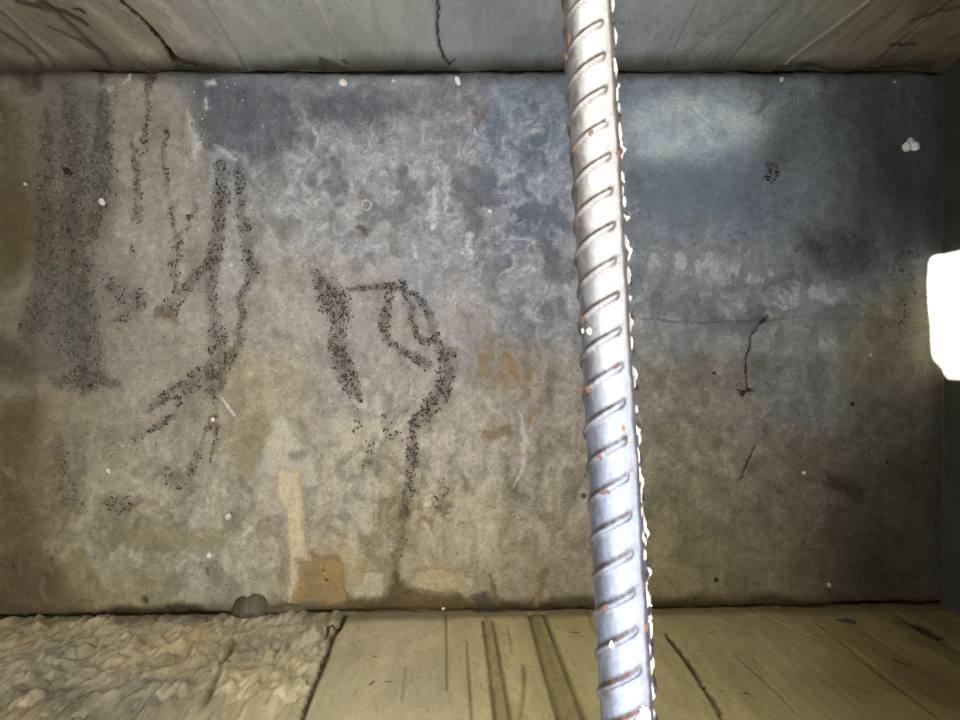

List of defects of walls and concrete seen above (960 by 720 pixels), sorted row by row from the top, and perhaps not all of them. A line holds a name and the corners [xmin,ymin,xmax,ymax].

crack [87,0,205,74]
crack [235,0,564,75]
crack [618,67,821,75]
crack [844,68,934,76]
damp [0,71,306,490]
crack [742,315,767,397]
damp [310,268,595,611]
damp [654,596,804,607]